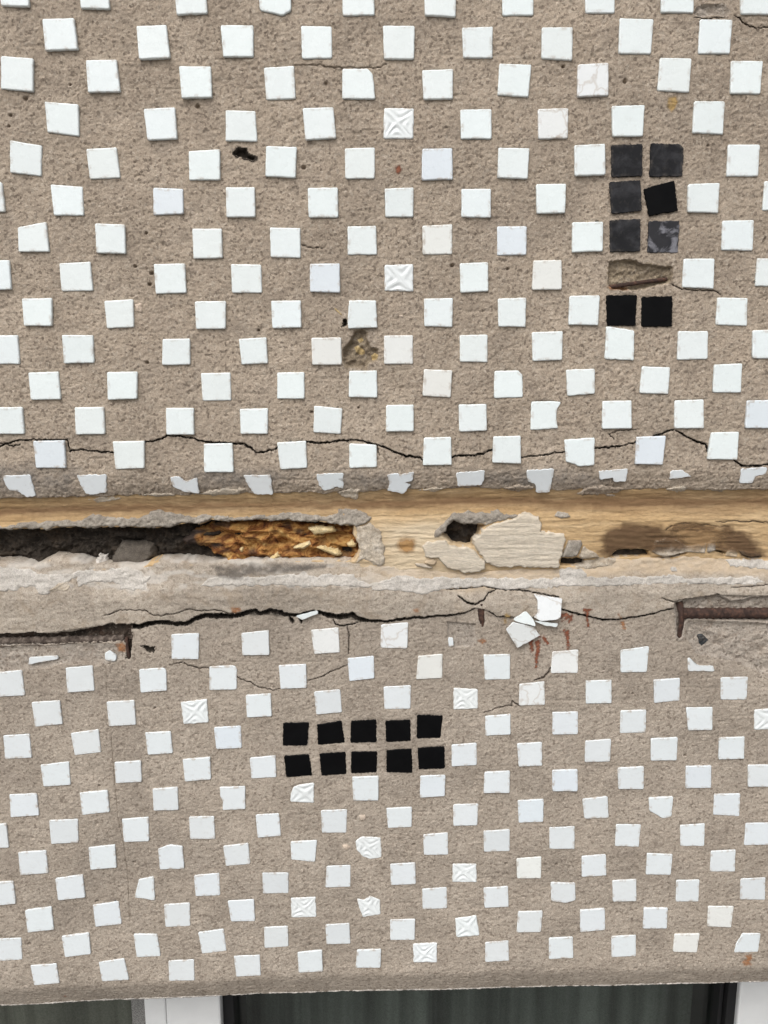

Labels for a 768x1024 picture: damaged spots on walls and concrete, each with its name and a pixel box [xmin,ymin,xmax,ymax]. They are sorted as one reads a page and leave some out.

spalling [606,258,674,291]
crack [146,435,278,453]
crack [306,439,423,460]
crack [594,429,708,452]
peeling [293,521,357,556]
spalling [444,521,478,543]
spalling [0,520,244,595]
crack [104,584,768,681]
peeling [201,544,768,674]
corrosion [561,608,592,650]
corrosion [676,601,768,638]
corrosion [529,636,549,668]